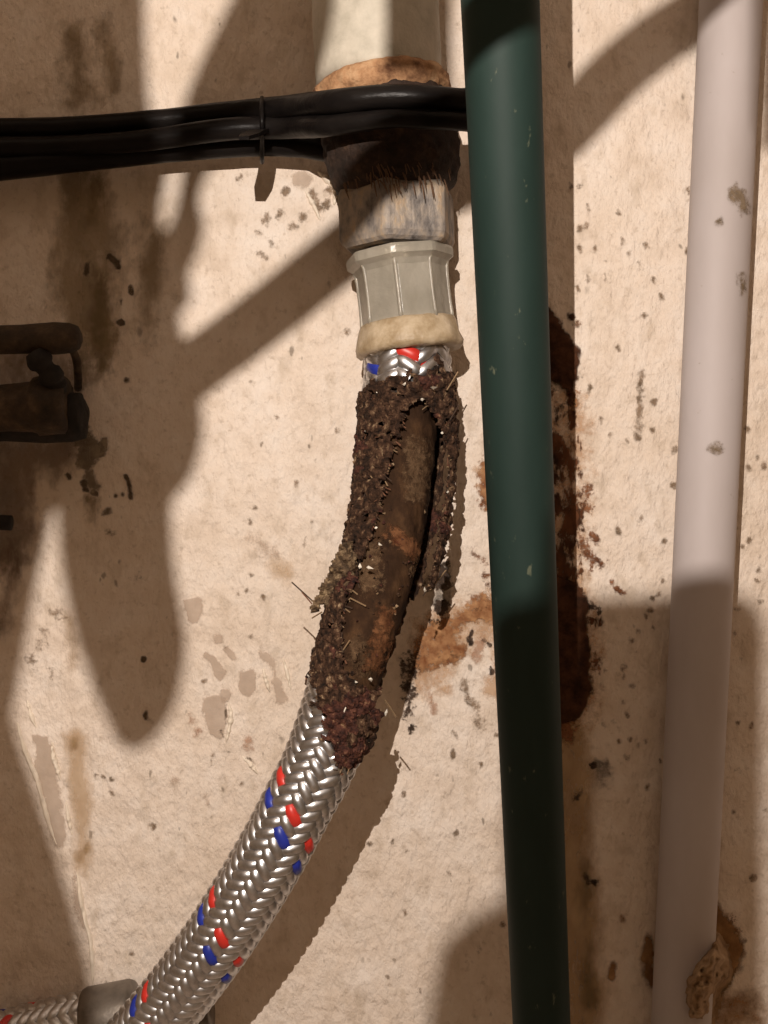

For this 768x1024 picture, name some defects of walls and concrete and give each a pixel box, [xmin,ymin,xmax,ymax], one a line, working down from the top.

leakage [57,172,158,371]
corrosion [474,461,487,511]
corrosion [549,307,604,727]
peeling [184,598,202,623]
peeling [196,635,291,742]
corrosion [413,553,493,714]